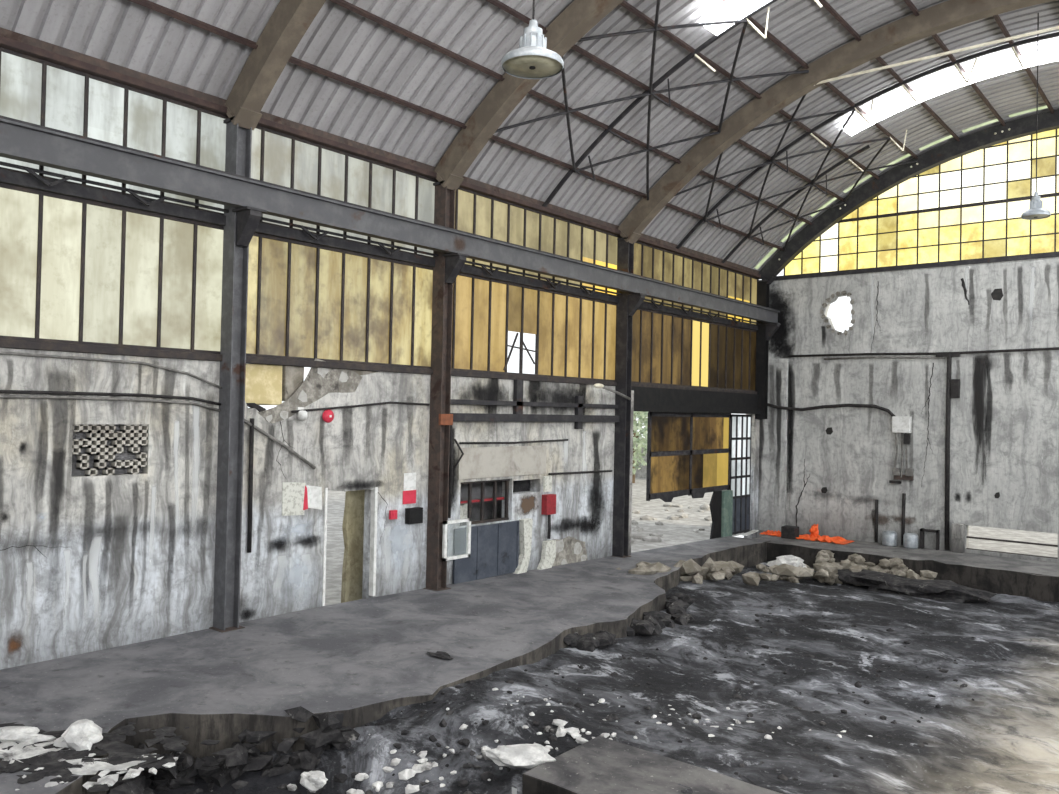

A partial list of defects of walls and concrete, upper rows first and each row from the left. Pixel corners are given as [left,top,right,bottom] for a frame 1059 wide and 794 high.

spalling [820,291,855,336]
water stain [776,365,795,479]
water stain [973,357,992,460]
rust [9,636,21,650]